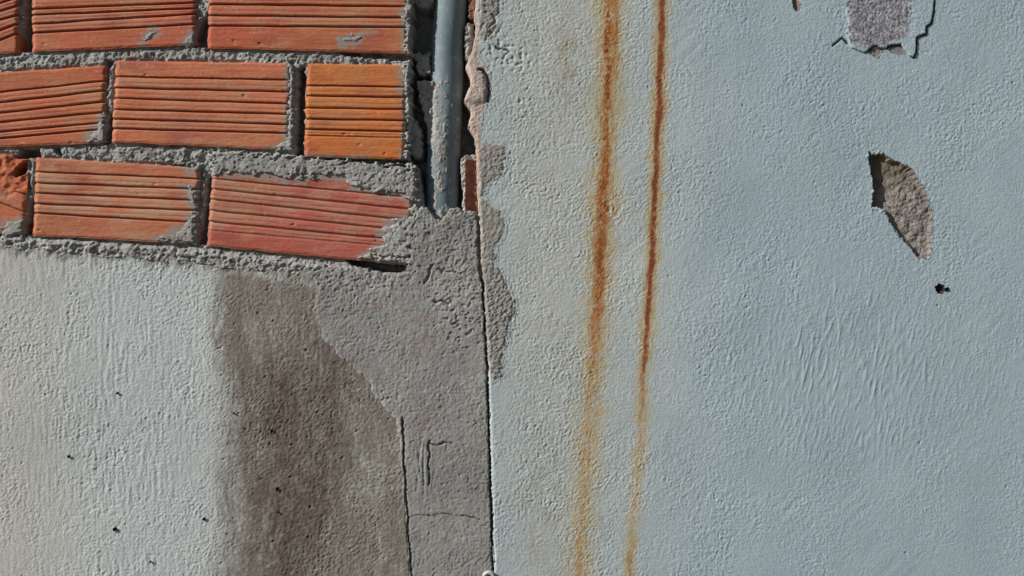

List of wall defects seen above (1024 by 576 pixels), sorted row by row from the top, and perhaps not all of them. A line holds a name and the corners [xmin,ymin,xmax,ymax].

peeling [845,0,935,59]
leakage [195,260,409,576]
crack [401,278,494,576]
rust [550,0,678,576]
spalling [865,149,934,260]